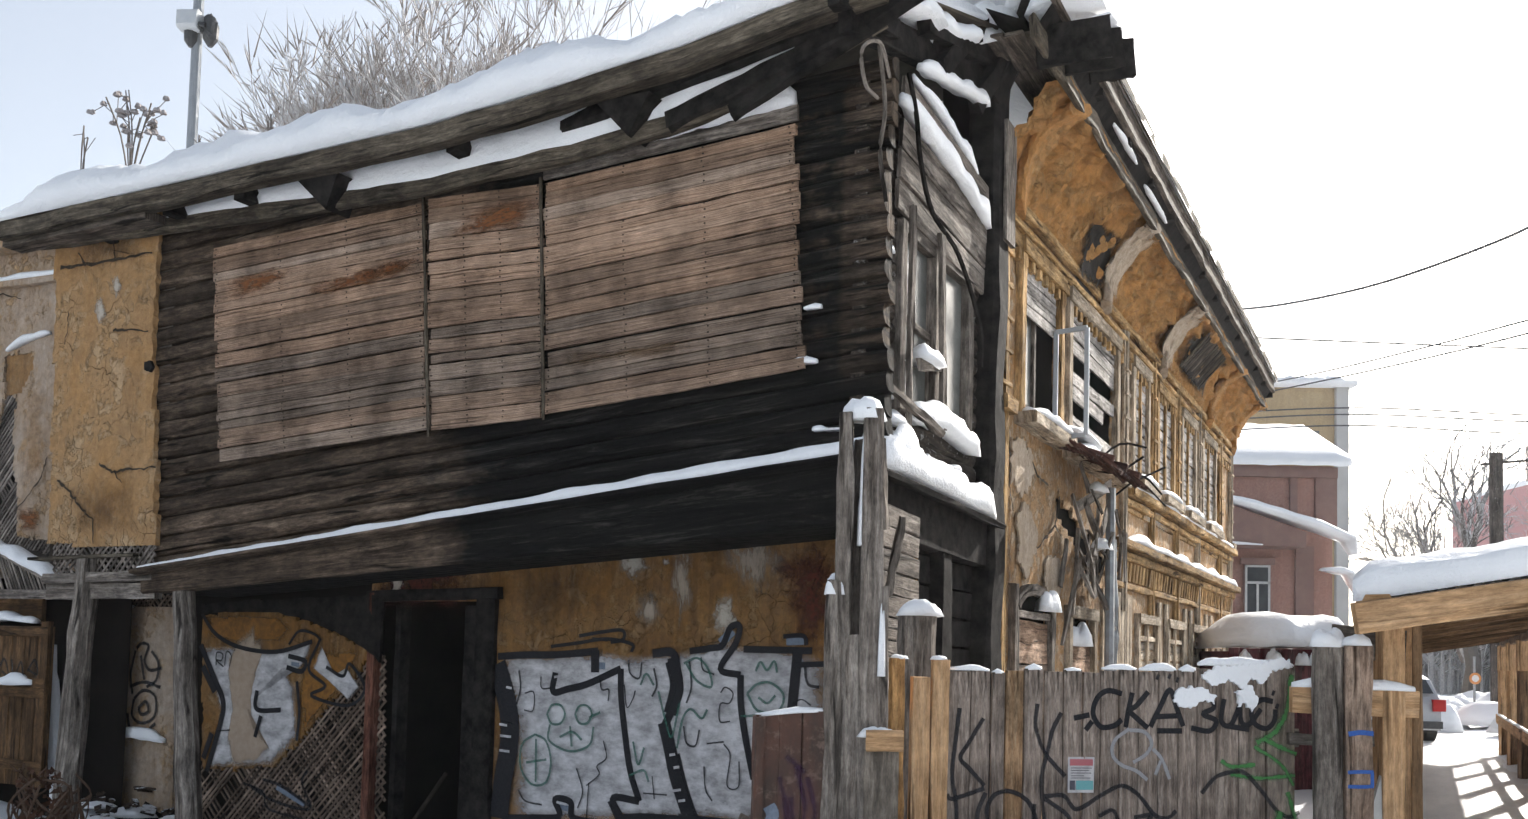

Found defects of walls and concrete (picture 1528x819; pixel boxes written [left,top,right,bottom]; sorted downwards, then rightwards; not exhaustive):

crack [60,243,152,270]
spalling [1105,226,1154,295]
crack [113,326,148,334]
spalling [1163,310,1203,367]
spalling [0,353,50,556]
crack [14,457,94,542]
crack [99,463,156,483]
flaking render [1009,437,1065,597]